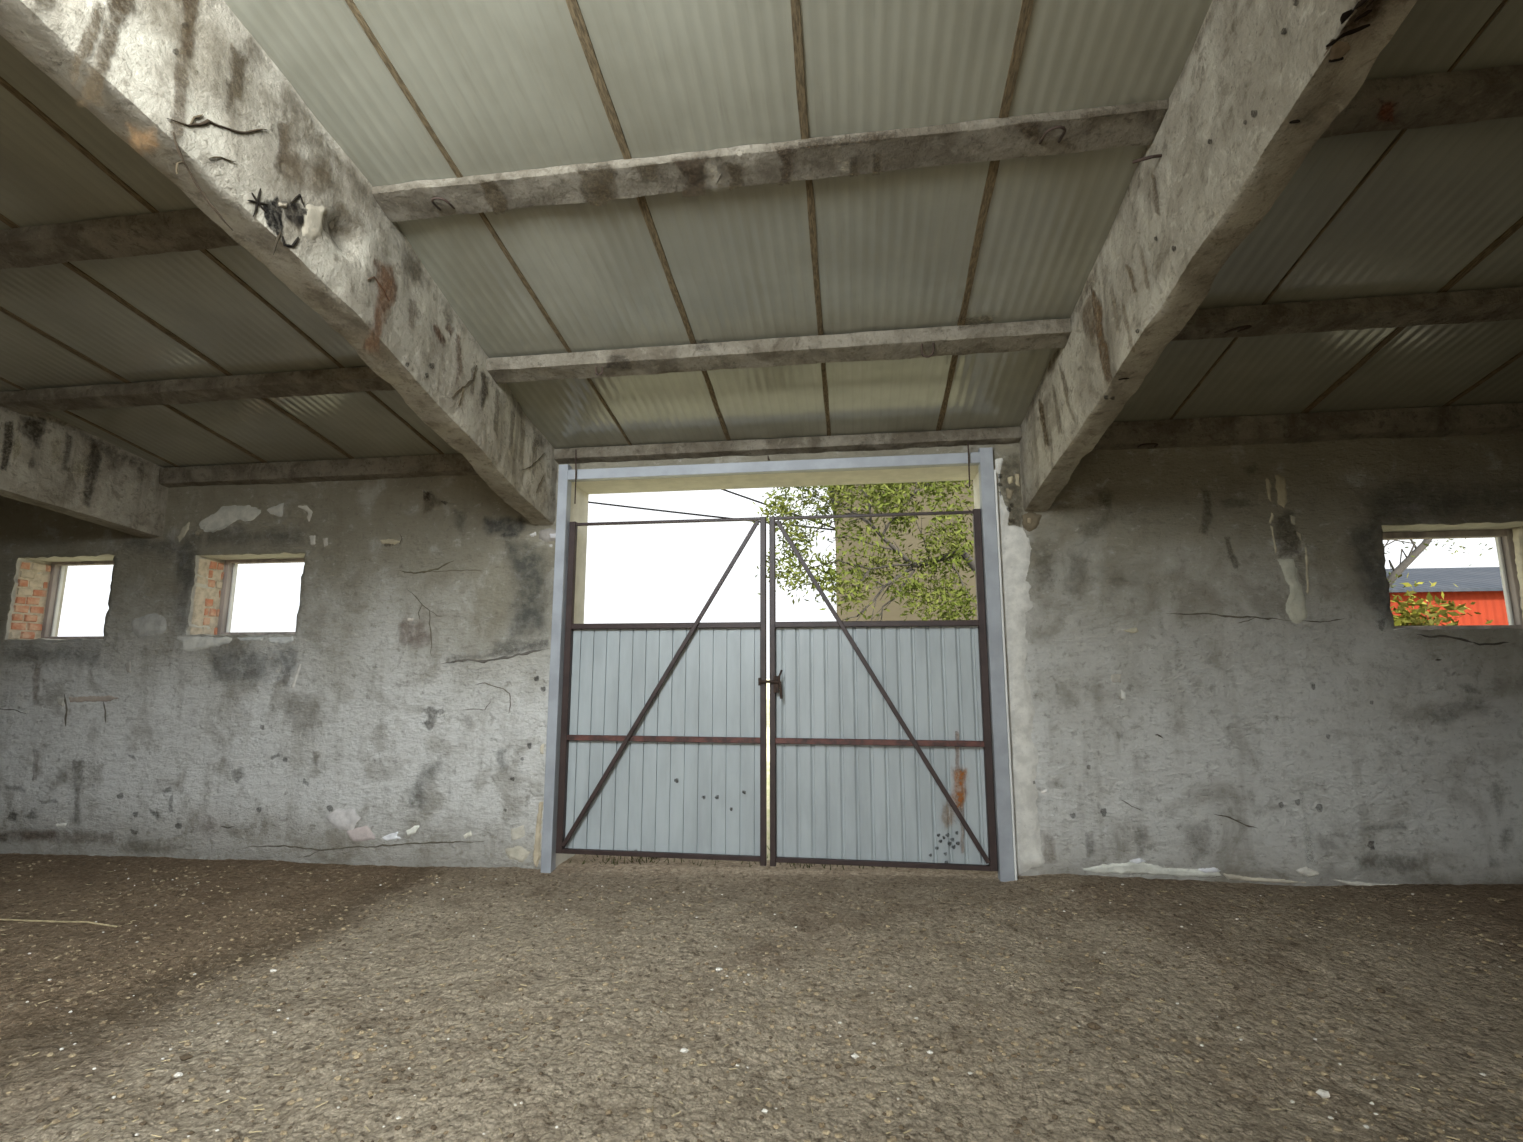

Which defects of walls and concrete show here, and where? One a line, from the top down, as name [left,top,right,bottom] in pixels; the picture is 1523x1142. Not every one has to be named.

damp [72,0,135,106]
damp [169,0,197,136]
flaking render [178,503,328,547]
spalling [997,462,1042,532]
spalling [1512,526,1523,618]
corrosion [954,770,966,808]